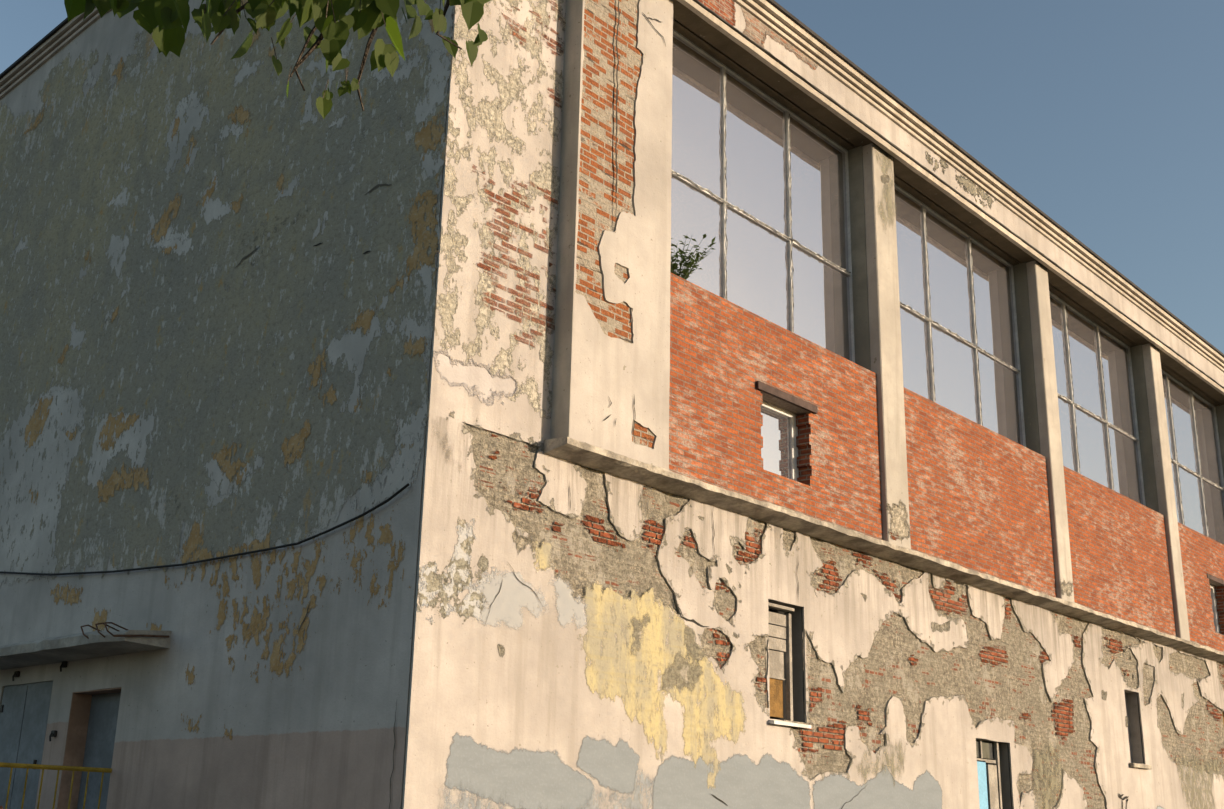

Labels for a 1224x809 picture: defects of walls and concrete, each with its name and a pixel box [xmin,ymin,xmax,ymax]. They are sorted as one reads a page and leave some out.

peeling [0,0,818,788]
spalling [885,500,910,542]
spalling [784,535,1224,809]